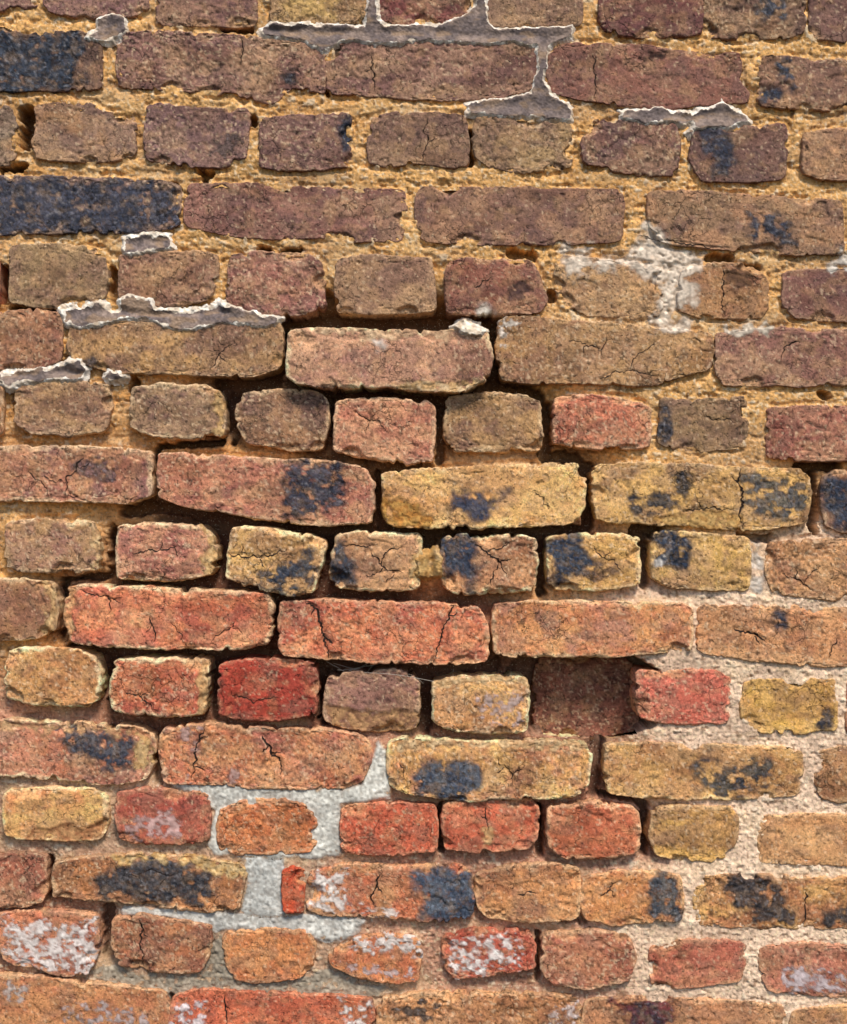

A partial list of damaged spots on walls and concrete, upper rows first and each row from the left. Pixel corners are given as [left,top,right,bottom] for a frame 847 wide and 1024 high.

crack [569,339,659,379]
crack [132,542,187,556]
crack [343,544,407,581]
crack [305,602,333,657]
crack [433,605,458,661]
crack [191,726,209,778]
crack [261,736,282,775]
crack [370,875,382,905]
leakage [3,916,98,974]
crack [139,920,148,963]
leakage [449,933,523,980]